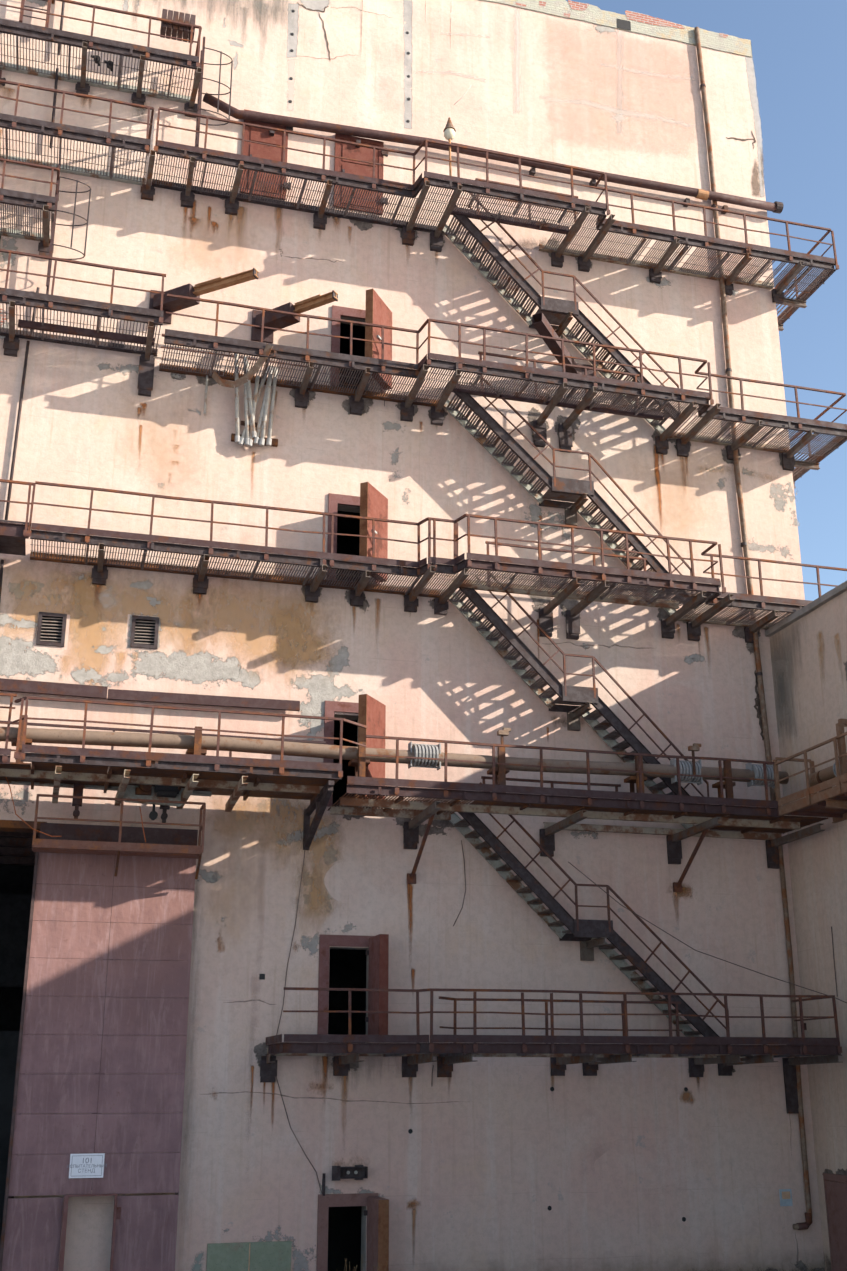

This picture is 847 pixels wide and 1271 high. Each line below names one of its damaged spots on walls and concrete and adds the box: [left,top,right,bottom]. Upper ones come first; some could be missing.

crack [297,0,391,60]
rust [138,403,147,449]
rust [654,445,664,515]
spalling [707,446,753,489]
peeling [770,482,800,526]
peeling [748,537,793,559]
peeling [0,579,261,689]
spalling [396,818,454,836]
peeling [277,815,364,911]
rust [251,1066,275,1116]